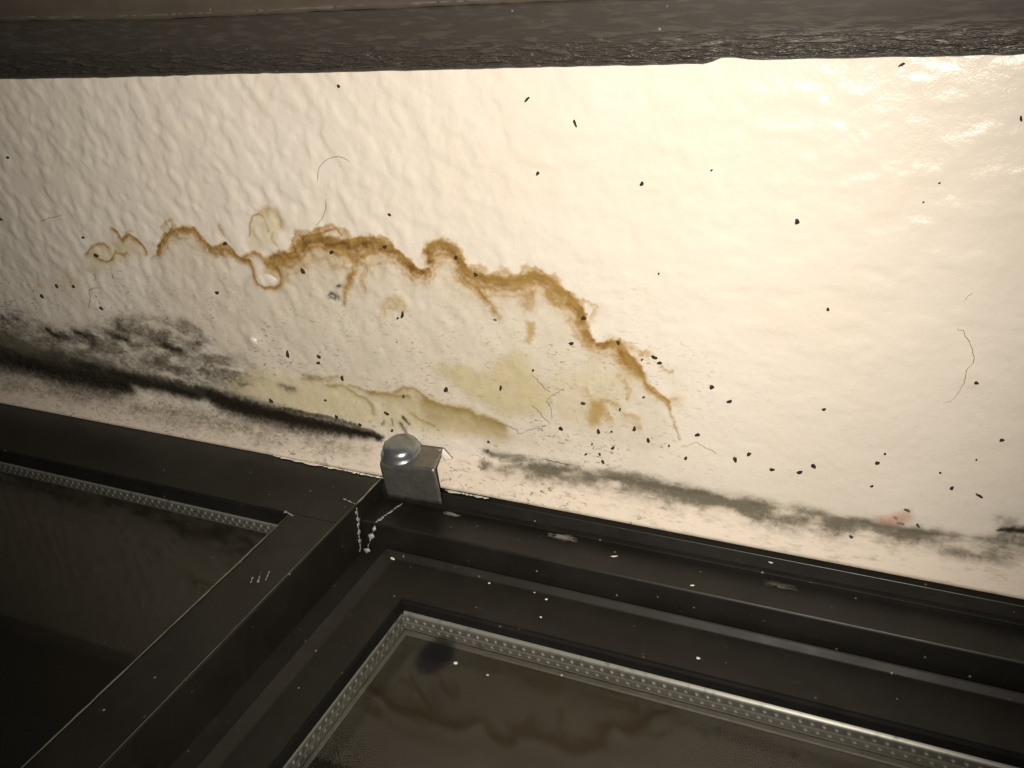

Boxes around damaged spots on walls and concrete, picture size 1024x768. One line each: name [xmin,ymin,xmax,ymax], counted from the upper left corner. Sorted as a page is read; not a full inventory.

damp [86,225,671,410]
damp [0,316,384,441]
damp [367,359,545,432]
damp [482,450,939,541]
damp [997,526,1024,537]